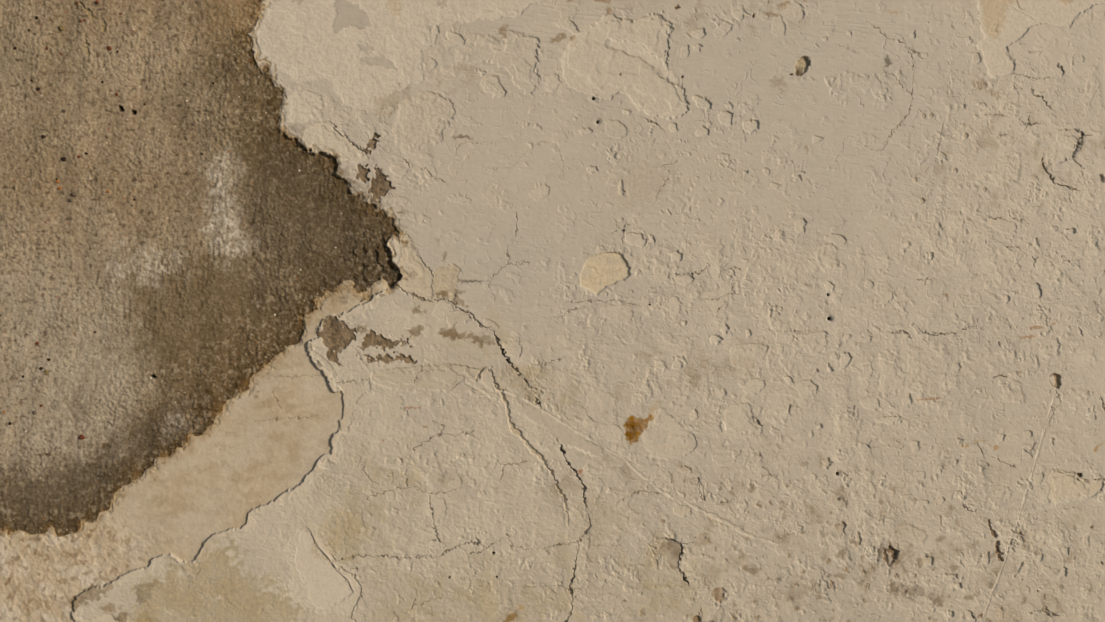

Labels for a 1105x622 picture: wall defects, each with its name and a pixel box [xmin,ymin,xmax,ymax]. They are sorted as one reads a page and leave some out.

peeling [556,4,760,135]
crack [984,51,1105,192]
water stain [0,118,408,534]
flaking render [0,0,545,622]
crack [395,213,566,406]
peeling [581,253,630,294]
water stain [310,497,385,570]
crack [341,421,621,622]
crack [556,438,670,504]
corrosion [623,401,662,446]
peeling [643,409,699,474]
peeling [711,588,727,604]